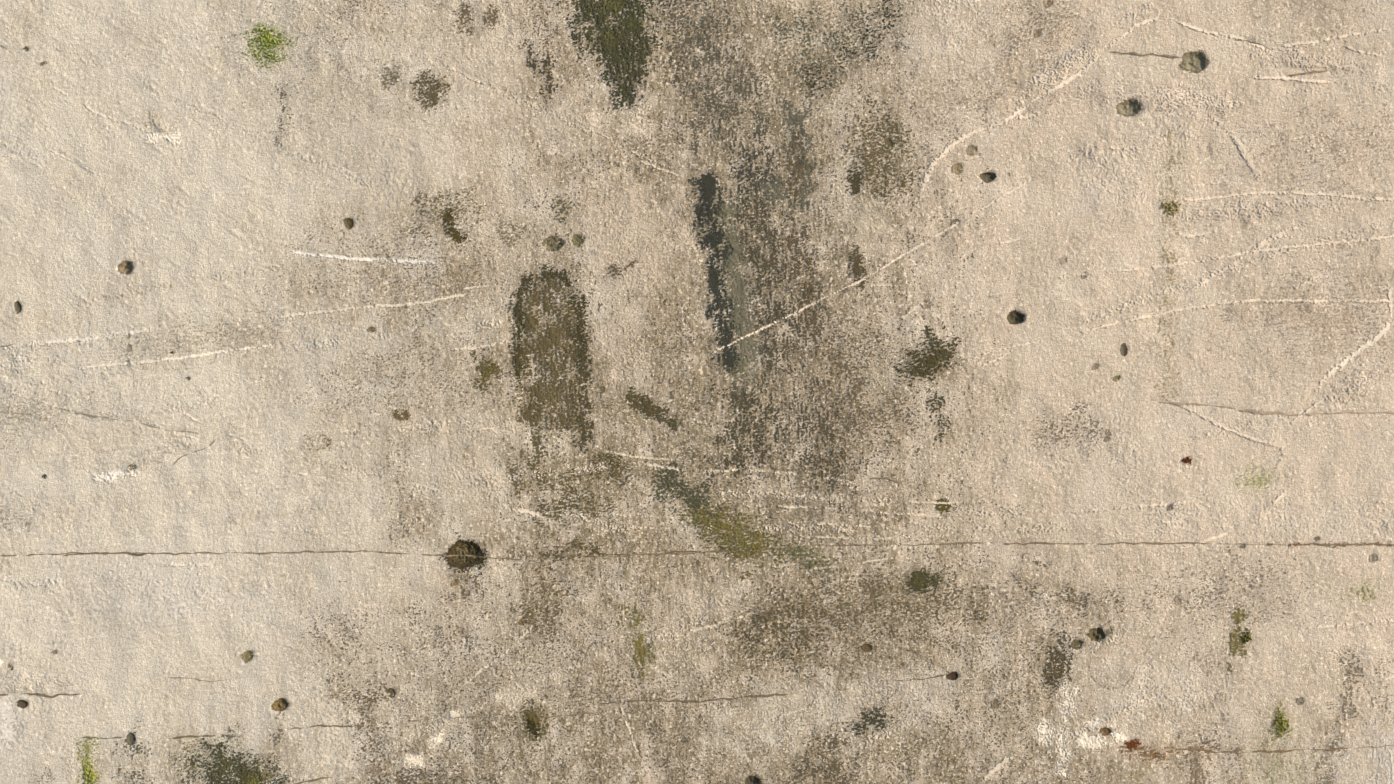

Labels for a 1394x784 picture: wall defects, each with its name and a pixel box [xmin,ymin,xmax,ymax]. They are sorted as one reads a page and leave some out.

leakage [591,0,1343,784]
crack [64,550,147,558]
leakage [301,263,644,784]
crack [659,548,731,556]
crack [0,691,79,699]
leakage [107,717,202,784]
leakage [269,710,290,767]